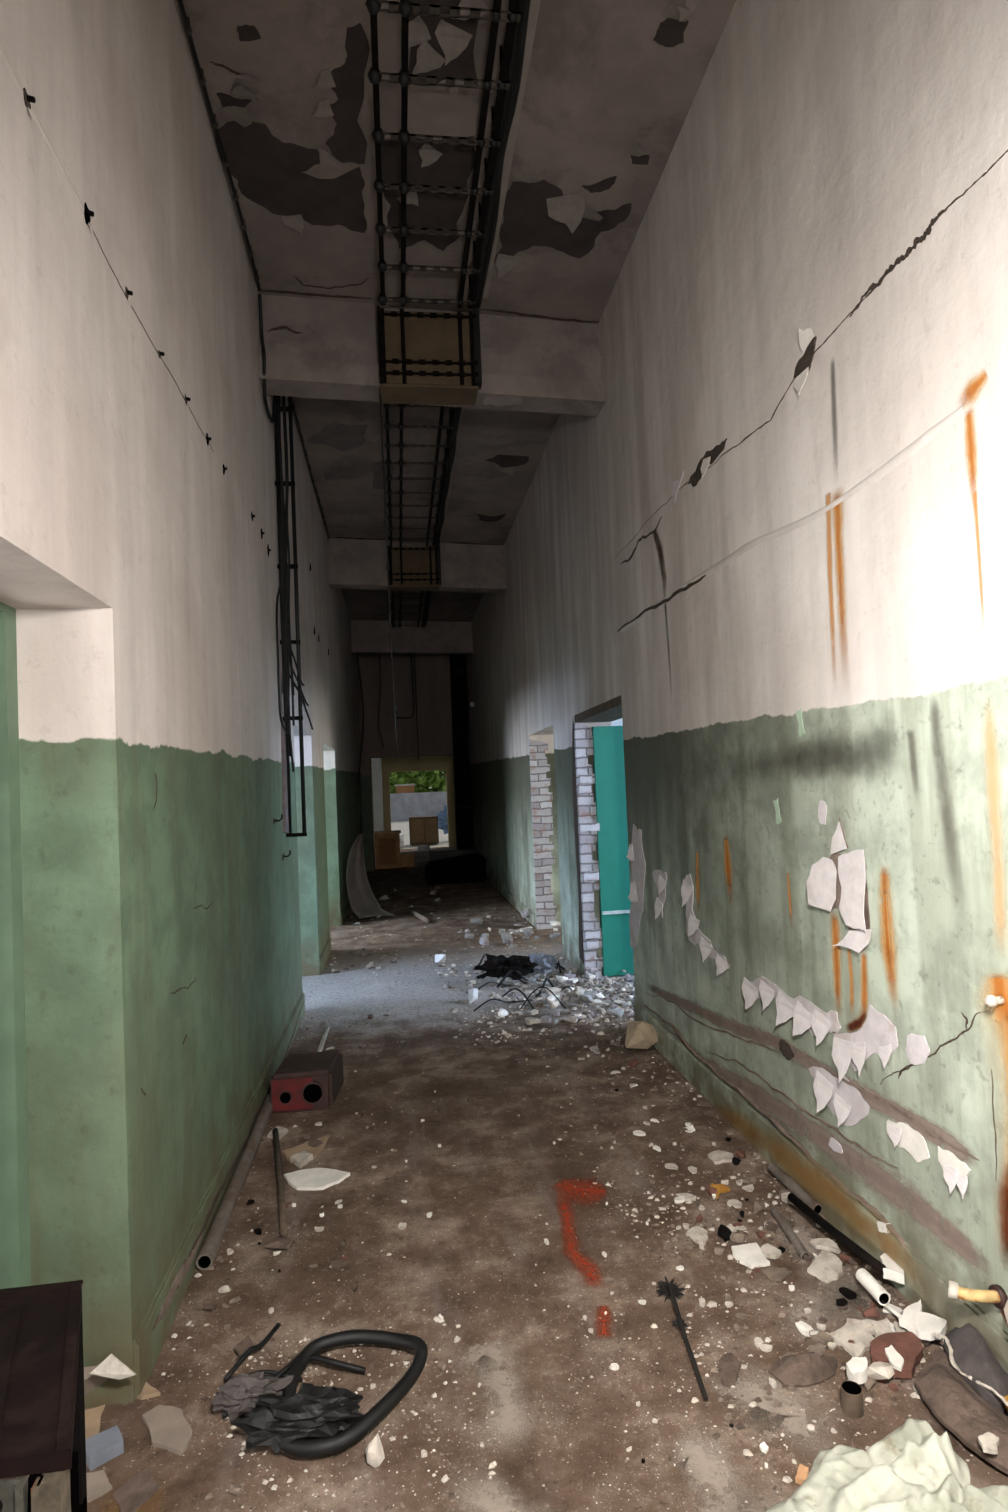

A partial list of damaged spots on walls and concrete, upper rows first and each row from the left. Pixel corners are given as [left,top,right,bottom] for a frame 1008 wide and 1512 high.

peeling [215,22,476,251]
crack [90,225,214,452]
crack [615,149,1008,564]
corrosion [826,494,845,642]
corrosion [965,372,986,605]
flaking render [572,722,603,978]
spalling [626,824,980,1268]
peeling [806,800,872,953]
corrosion [832,871,895,1031]
crack [880,1007,991,1085]
crack [990,1069,998,1173]
corrosion [1000,1173,1008,1256]